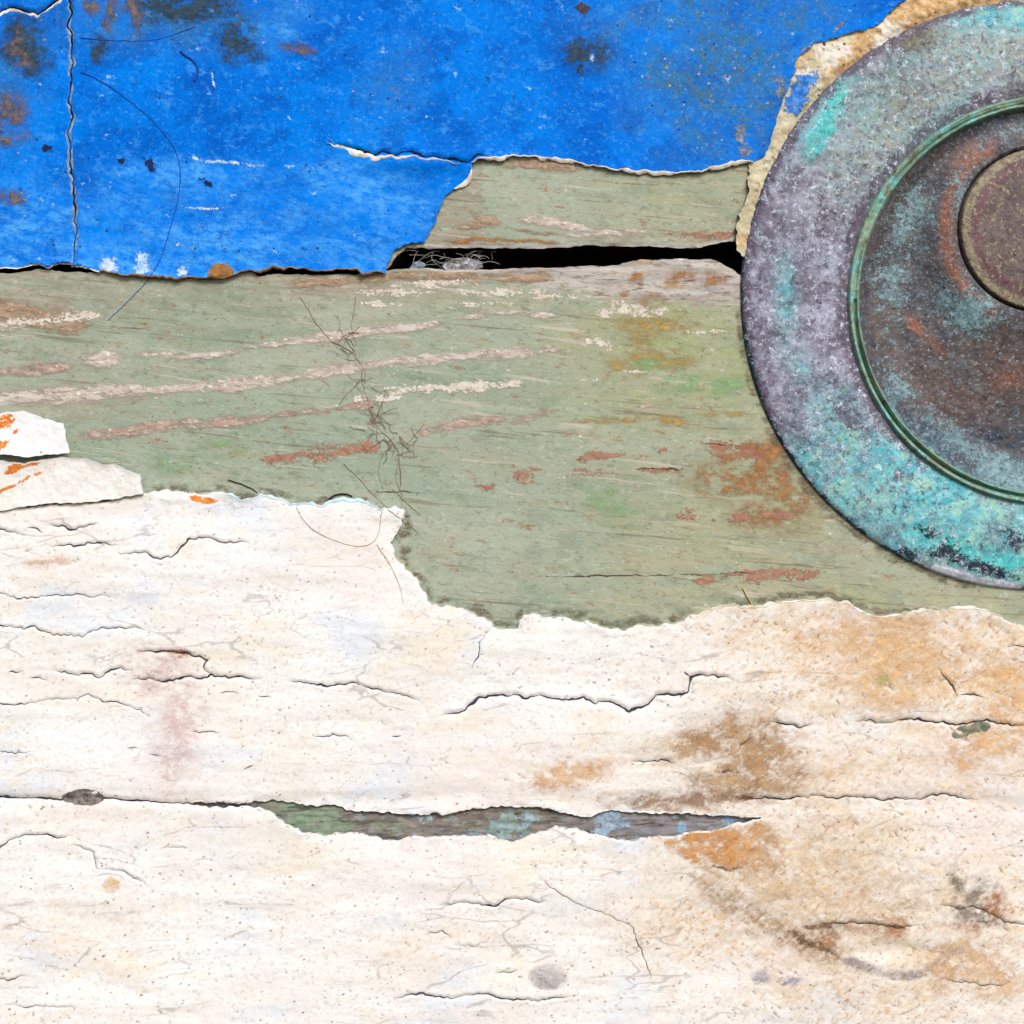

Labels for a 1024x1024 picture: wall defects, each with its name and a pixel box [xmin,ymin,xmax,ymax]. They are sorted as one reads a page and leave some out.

crack [0,0,77,262]
peeling [0,0,754,392]
peeling [0,345,561,511]
peeling [705,418,976,588]
crack [0,523,249,560]
peeling [654,568,1002,618]
crack [0,625,270,713]
crack [448,672,734,714]
crack [861,668,1019,726]
spalling [62,789,104,805]
crack [103,797,246,806]
spalling [194,799,760,841]